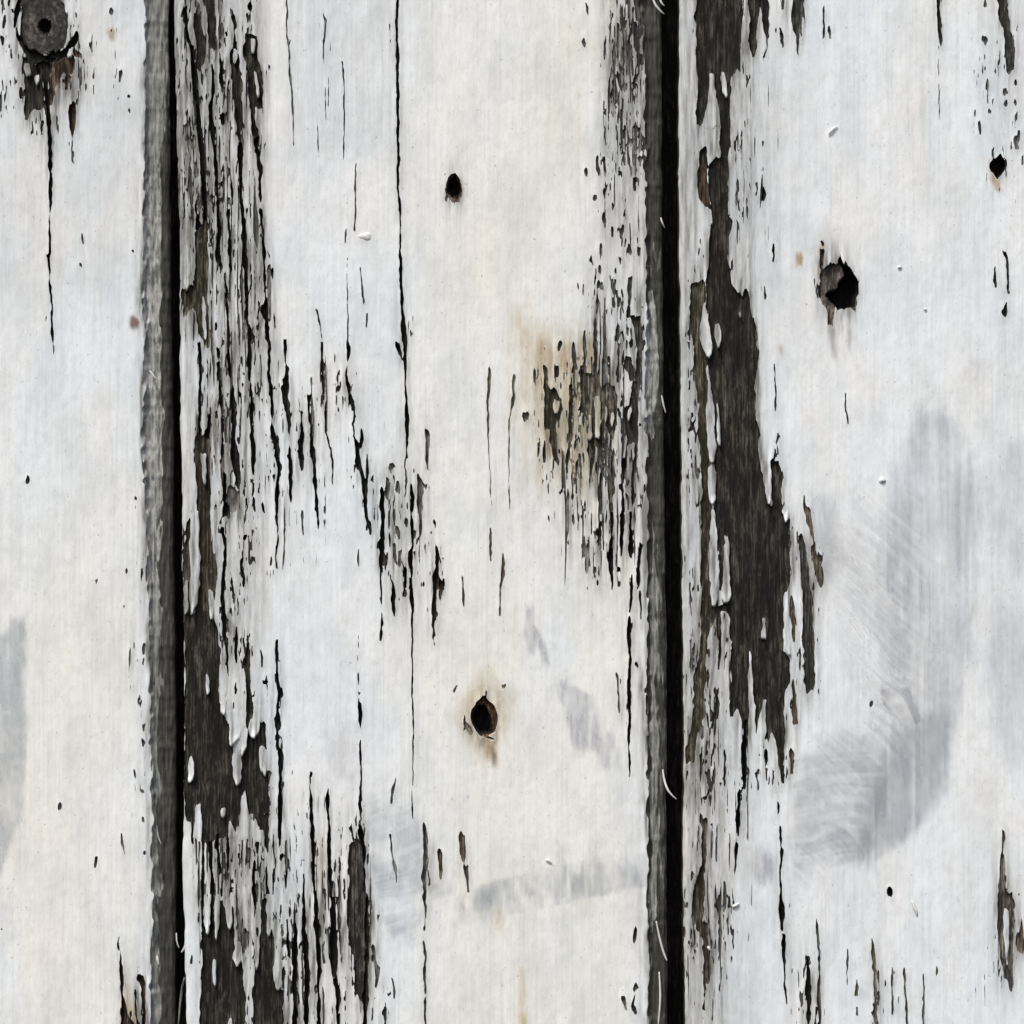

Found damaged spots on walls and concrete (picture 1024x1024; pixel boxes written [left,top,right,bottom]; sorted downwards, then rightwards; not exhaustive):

crack [14,0,79,354]
peeling [528,0,647,590]
peeling [973,0,1024,176]
peeling [175,0,389,1024]
crack [178,0,465,1024]
peeling [362,463,444,617]
peeling [682,0,825,1024]
peeling [458,831,469,893]
peeling [987,830,1024,992]